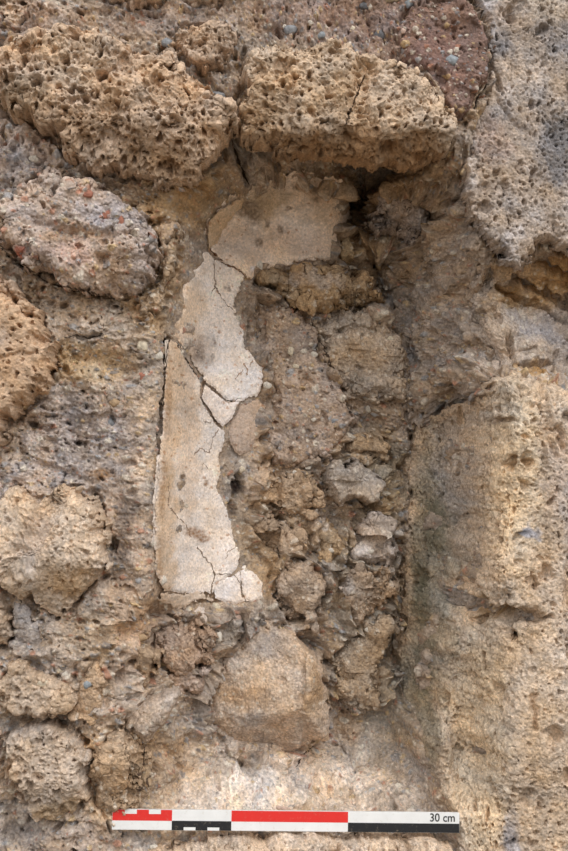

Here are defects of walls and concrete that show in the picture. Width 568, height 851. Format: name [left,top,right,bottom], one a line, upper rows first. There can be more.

crack [210,250,247,311]
crack [156,338,253,470]
peeling [151,170,356,623]
crack [168,483,243,598]